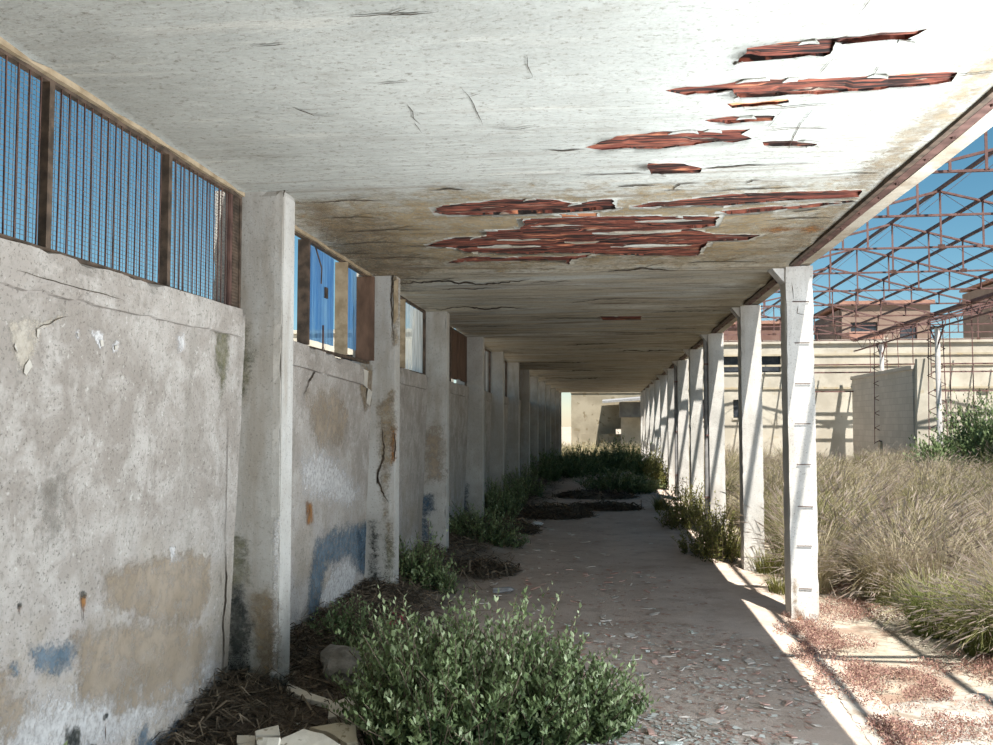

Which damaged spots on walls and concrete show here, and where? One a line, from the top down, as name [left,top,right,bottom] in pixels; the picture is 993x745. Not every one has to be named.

spalling [733,30,920,65]
spalling [591,72,957,150]
spalling [644,163,701,177]
spalling [431,190,862,263]
crack [17,270,119,299]
crack [36,314,67,328]
crack [377,430,388,501]
water stain [228,519,287,694]
water stain [0,547,214,745]